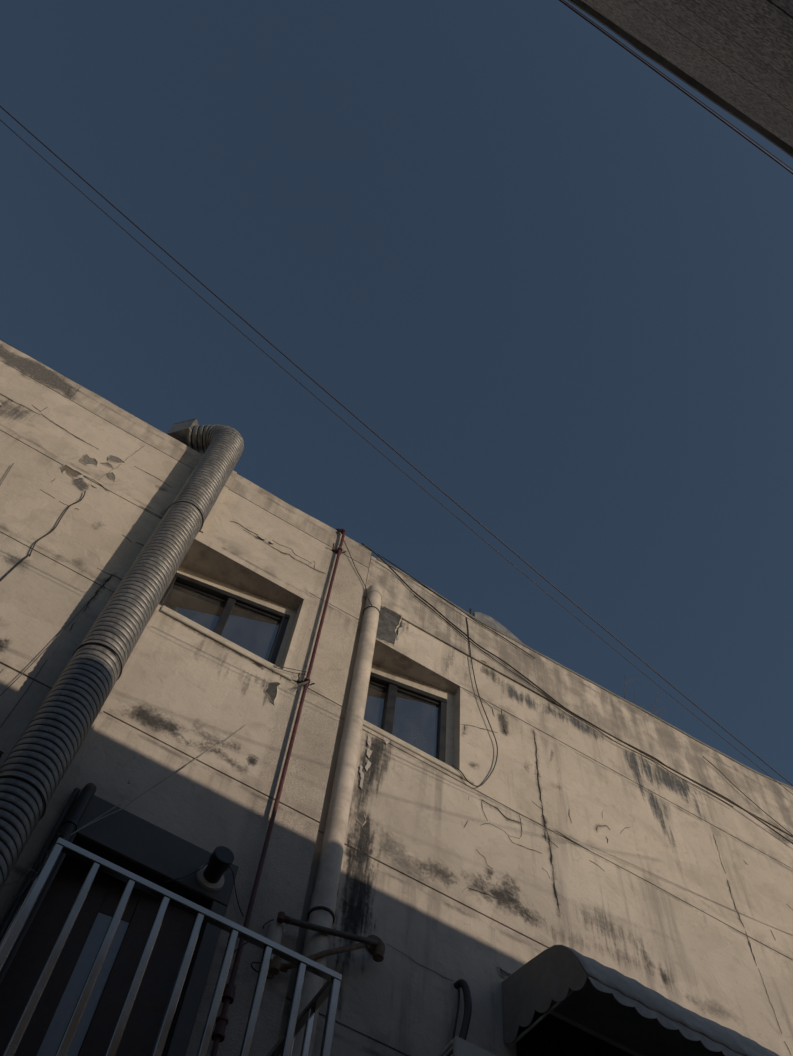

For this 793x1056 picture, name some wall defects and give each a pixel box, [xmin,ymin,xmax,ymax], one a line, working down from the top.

leakage [0,346,76,398]
peeling [59,445,145,490]
leakage [132,706,178,735]
leakage [625,751,689,829]
crack [464,734,627,911]
leakage [474,871,533,921]